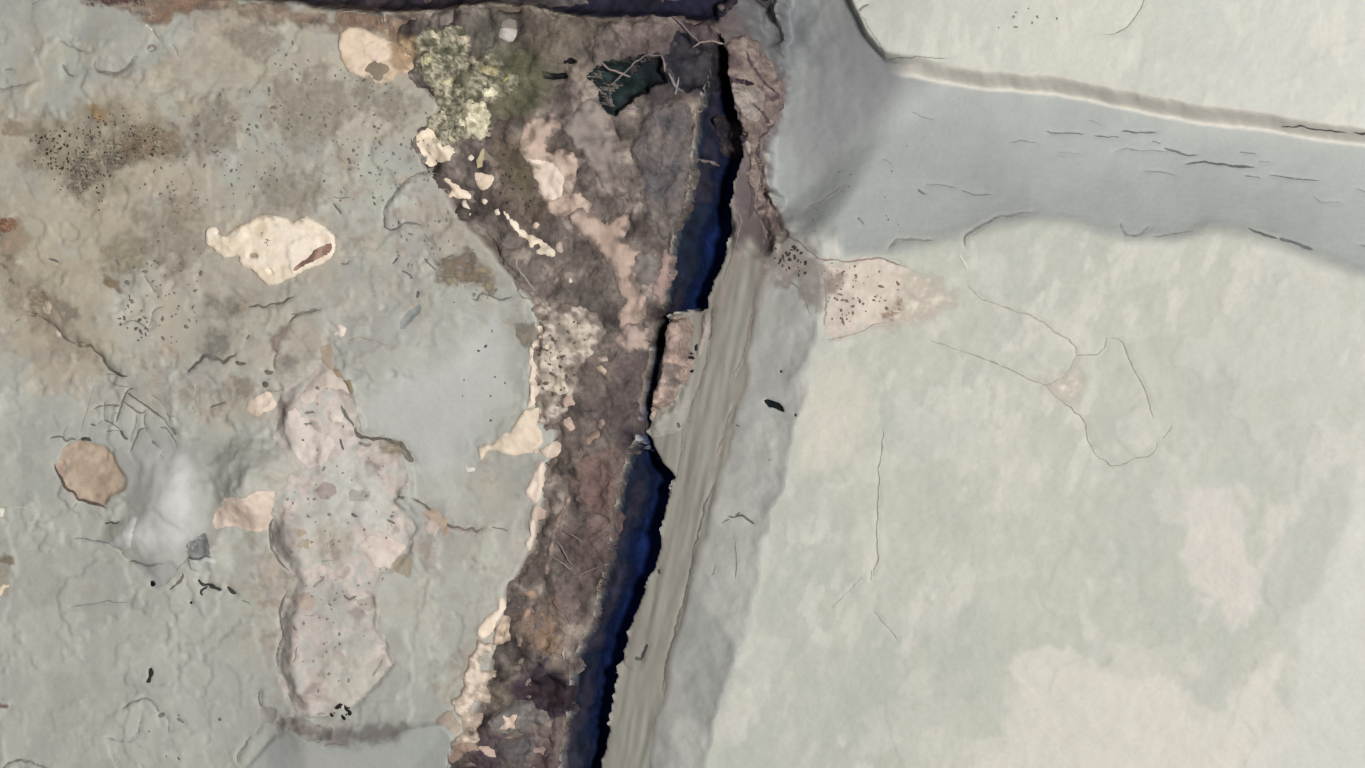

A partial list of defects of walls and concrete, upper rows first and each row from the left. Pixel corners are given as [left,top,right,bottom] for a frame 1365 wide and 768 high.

flaking render [50,430,127,513]
crack [0,264,178,466]
leakage [0,25,412,353]
crack [198,579,250,604]
flaking render [134,297,415,762]
peeling [205,214,350,286]
spalling [338,2,787,768]
crack [624,153,932,687]
peeling [819,256,955,340]
crack [882,159,1173,467]
crack [1010,120,1365,203]
crack [1249,228,1313,250]